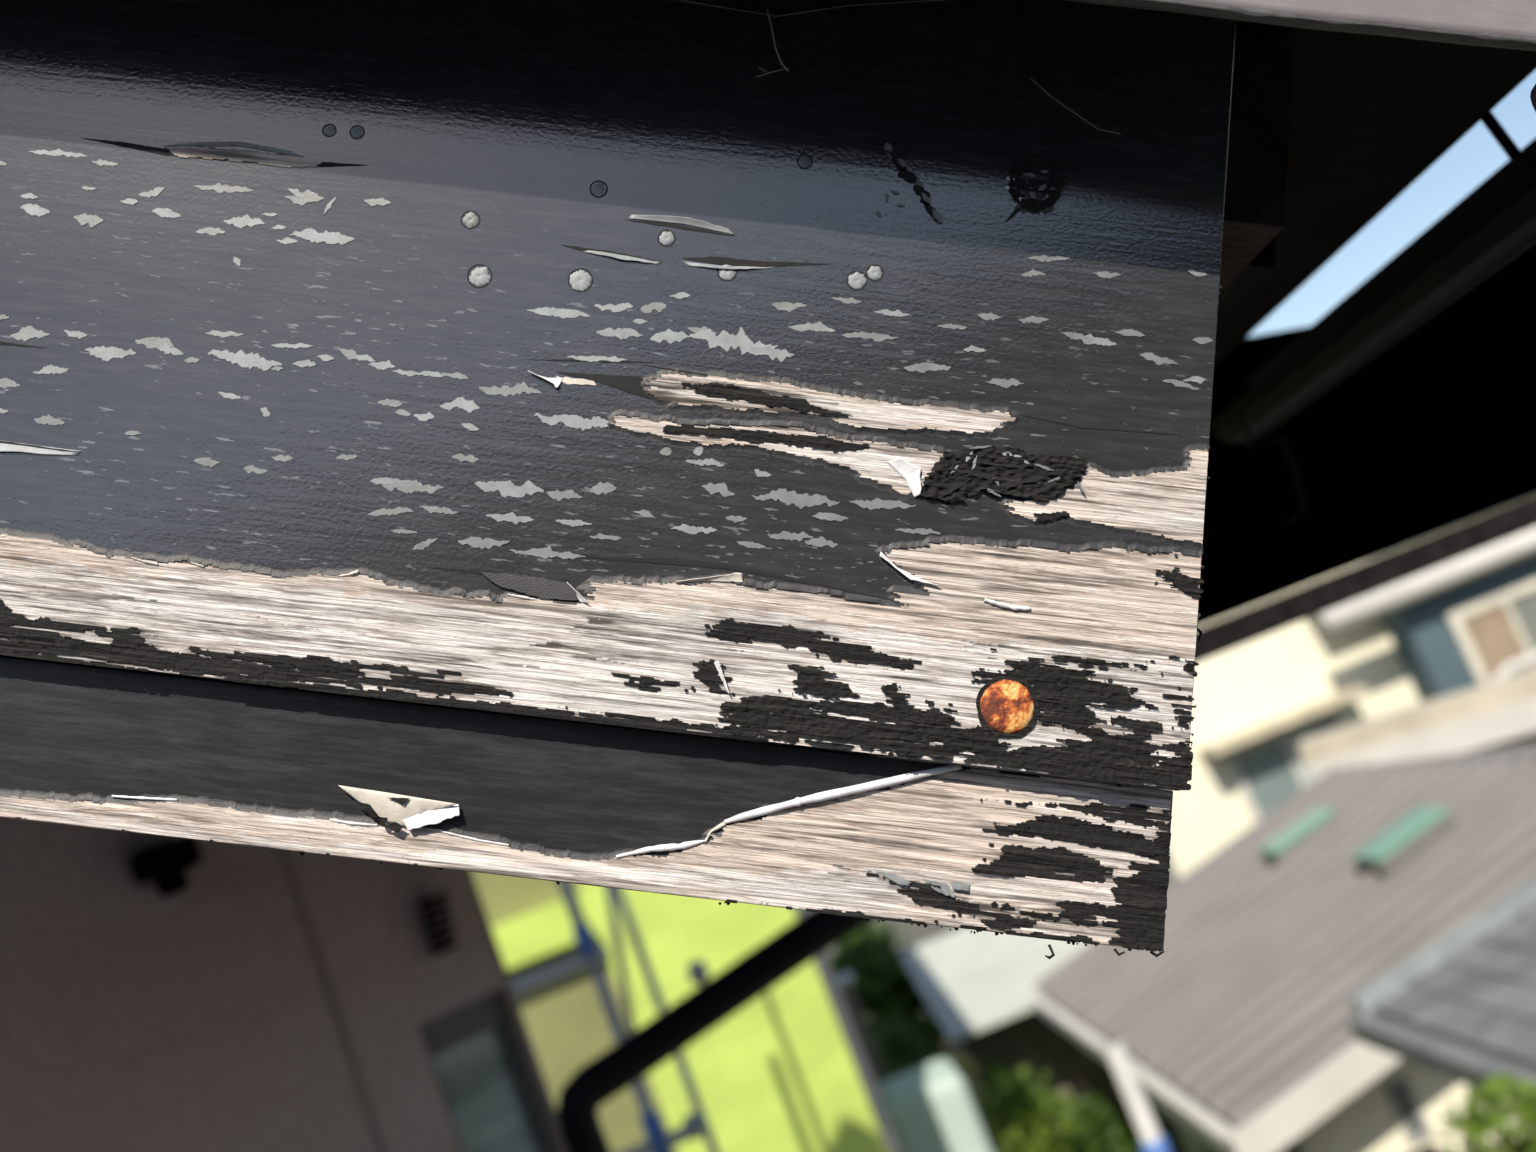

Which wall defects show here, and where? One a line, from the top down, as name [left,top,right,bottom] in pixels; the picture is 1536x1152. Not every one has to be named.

peeling [29,149,118,166]
peeling [194,183,253,194]
peeling [21,193,50,217]
peeling [120,187,181,218]
peeling [364,198,391,206]
peeling [74,213,103,228]
peeling [196,189,354,245]
peeling [584,250,662,264]
peeling [683,261,774,269]
peeling [1022,255,1070,277]
peeling [1093,271,1121,279]
peeling [0,292,1210,952]